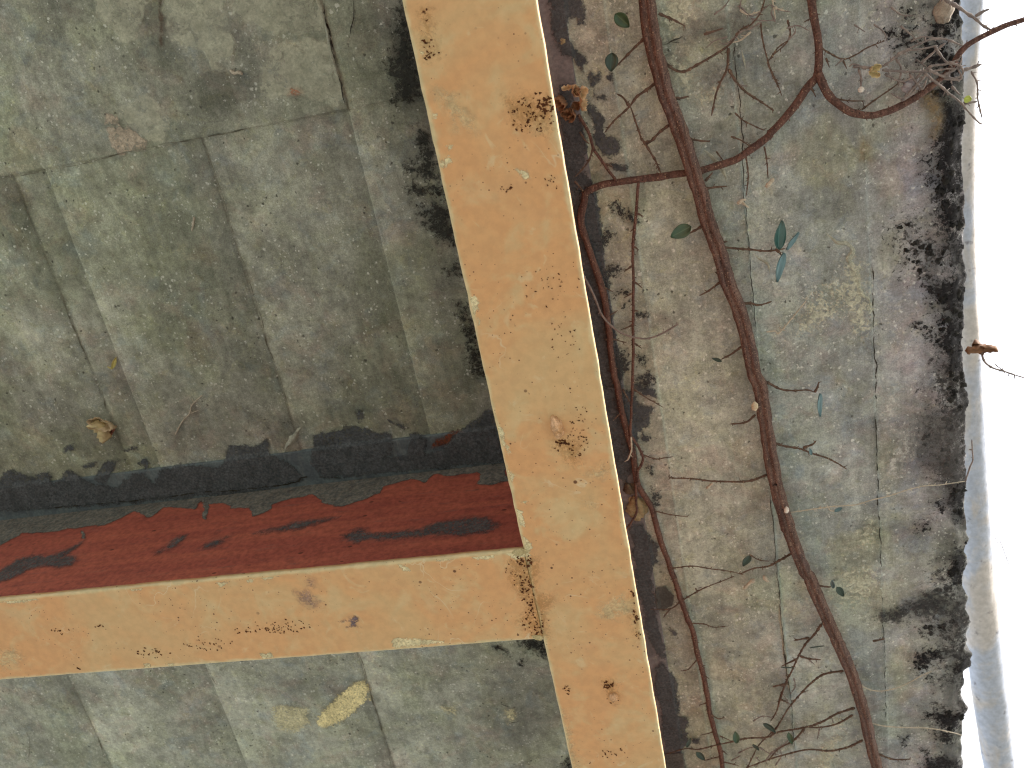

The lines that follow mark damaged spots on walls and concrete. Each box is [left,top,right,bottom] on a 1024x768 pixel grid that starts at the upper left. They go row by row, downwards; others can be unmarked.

leakage [382,1,424,107]
leakage [656,0,696,31]
leakage [663,53,694,93]
leakage [401,122,456,247]
leakage [548,0,657,483]
leakage [453,301,486,377]
leakage [869,0,971,683]
crack [871,266,882,566]
peeling [507,501,533,559]
leakage [491,639,547,666]
leakage [629,524,700,768]
mould [897,706,967,768]